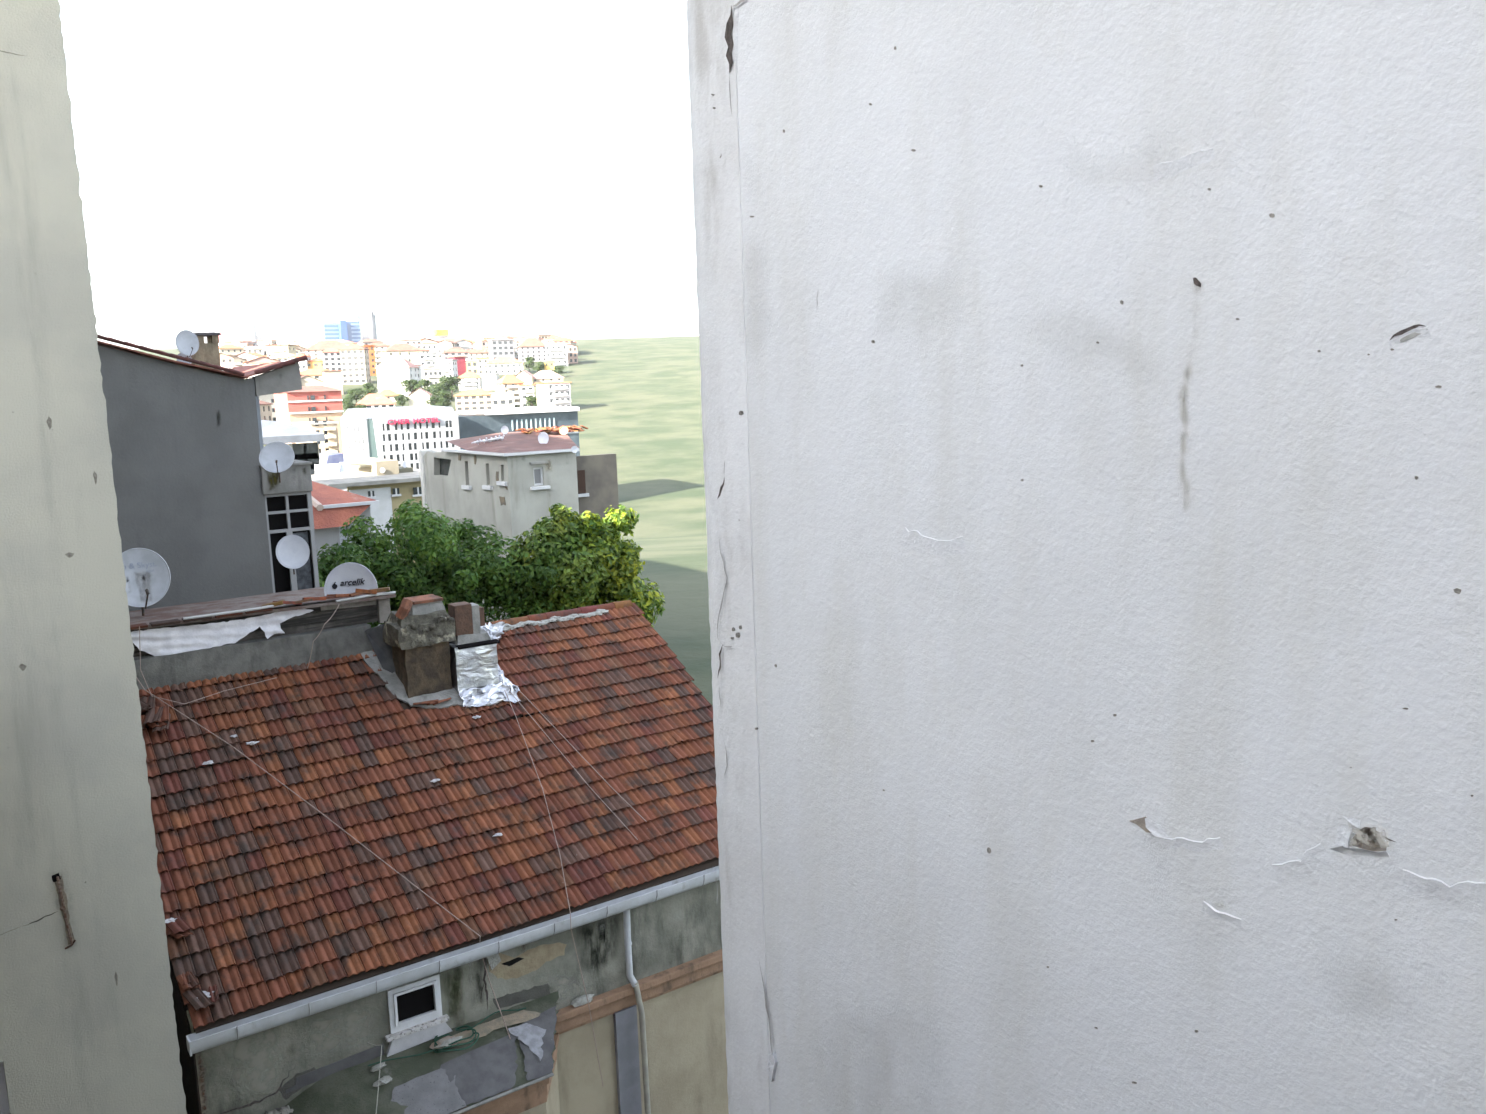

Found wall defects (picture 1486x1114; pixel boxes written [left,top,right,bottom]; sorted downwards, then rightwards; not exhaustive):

flaking render [1129,817,1225,853]
flaking render [1332,816,1395,857]
flaking render [487,942,567,1009]